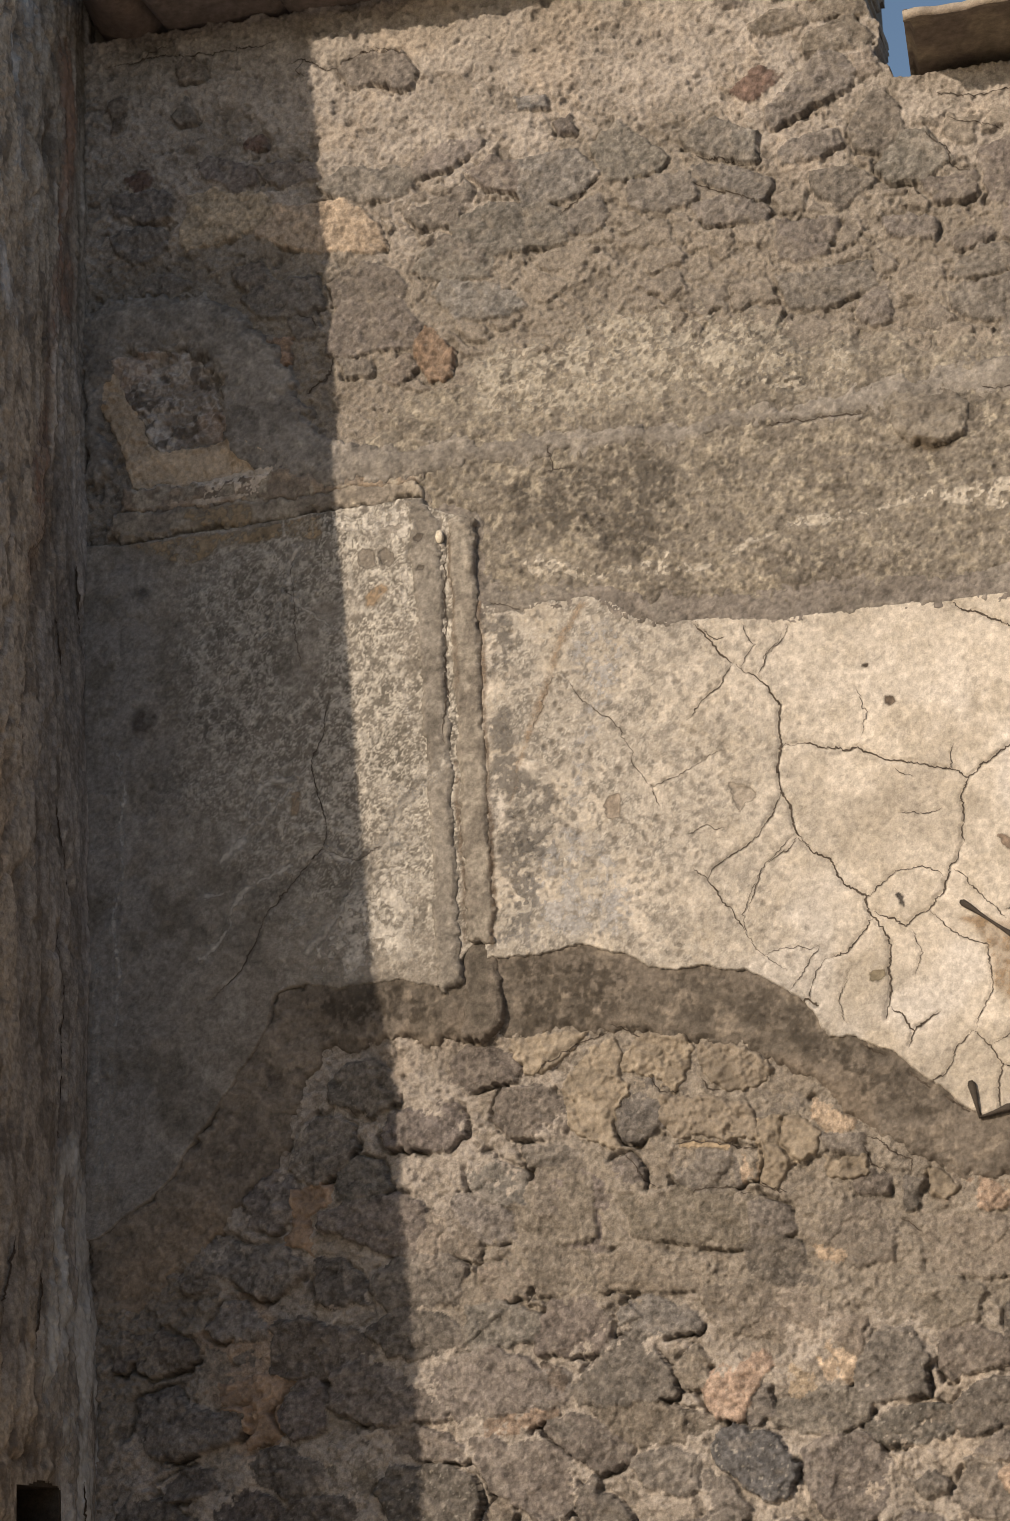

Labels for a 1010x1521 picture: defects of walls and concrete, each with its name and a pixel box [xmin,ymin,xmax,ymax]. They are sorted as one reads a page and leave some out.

peeling [98,351,276,509]
spalling [357,547,394,570]
crack [953,602,1010,626]
crack [198,545,450,1000]
crack [533,675,723,804]
crack [689,624,1010,1112]
spalling [869,969,886,981]
crack [538,1024,640,1072]
crack [648,1074,721,1093]
peeling [508,1030,871,1190]
peeling [924,1167,962,1200]
peeling [217,1373,297,1451]